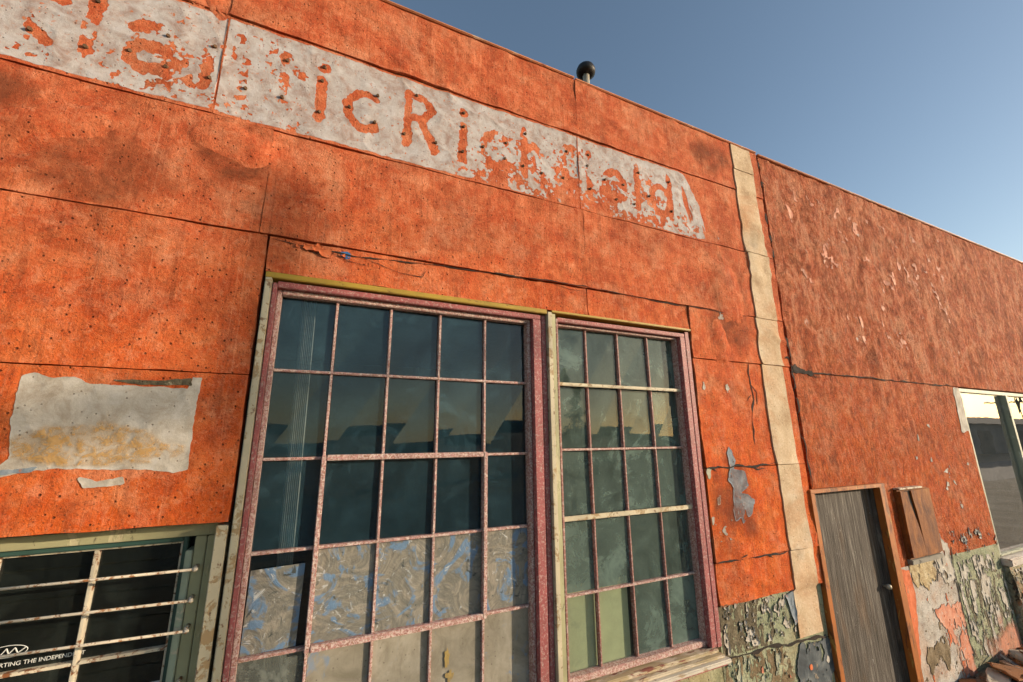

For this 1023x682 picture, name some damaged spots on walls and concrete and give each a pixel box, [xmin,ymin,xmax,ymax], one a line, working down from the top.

peeling [296,243,352,259]
peeling [0,372,202,488]
peeling [712,447,755,542]
spalling [718,590,835,682]
peeling [902,527,1023,682]